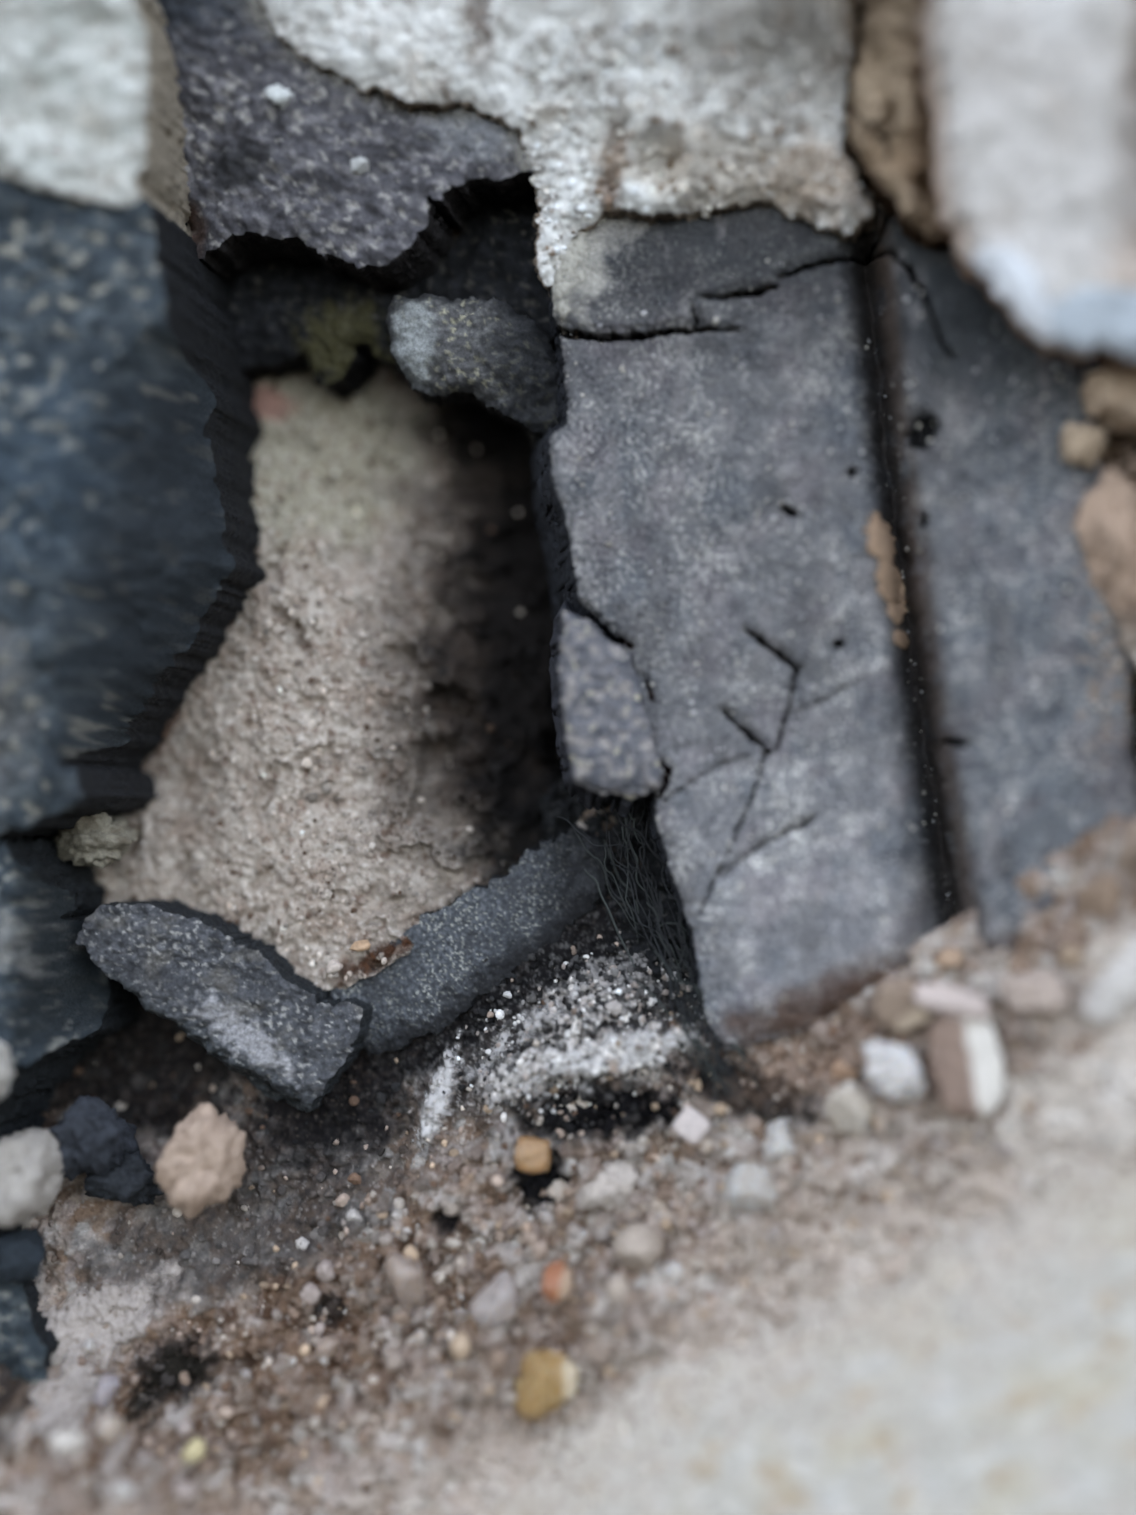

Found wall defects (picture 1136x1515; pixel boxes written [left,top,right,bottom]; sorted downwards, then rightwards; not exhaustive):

crack [559,217,951,355]
spalling [91,364,664,991]
crack [578,601,655,703]
crack [656,761,673,799]
crack [708,629,813,891]